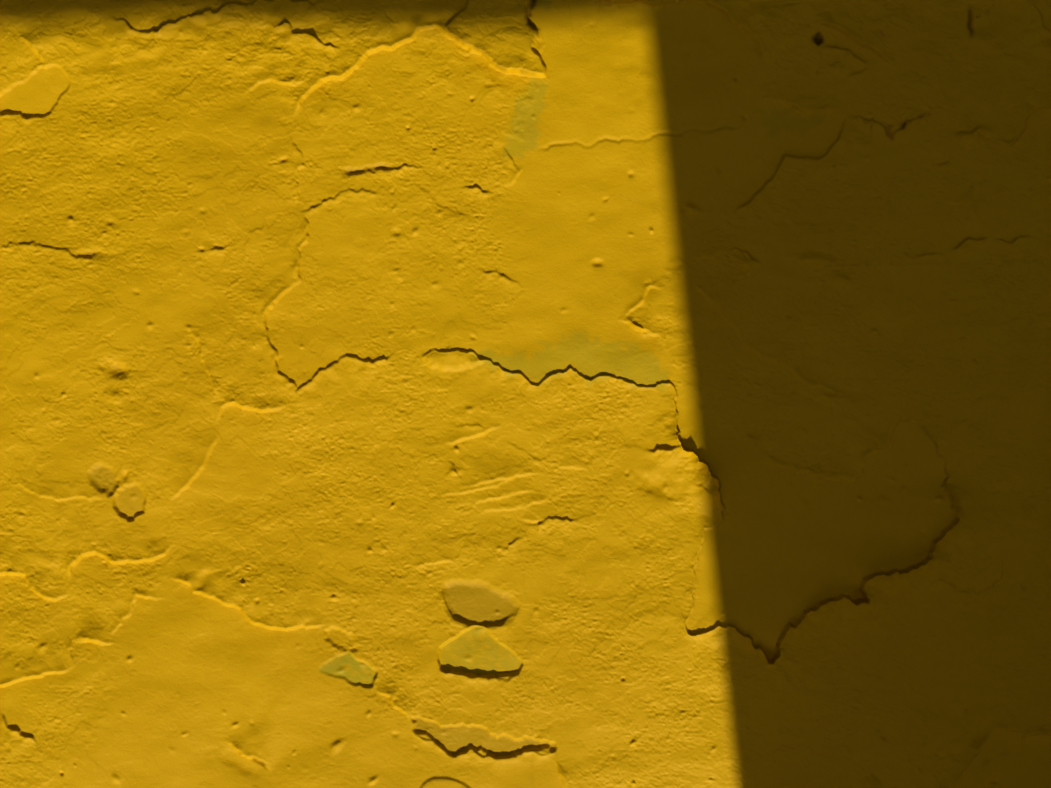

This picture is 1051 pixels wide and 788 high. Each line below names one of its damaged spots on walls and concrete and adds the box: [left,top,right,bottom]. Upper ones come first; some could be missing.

peeling [0,28,74,124]
peeling [264,18,342,58]
crack [239,10,544,116]
flaking render [0,238,112,265]
peeling [418,0,970,674]
peeling [317,624,382,691]
peeling [435,628,527,688]
peeling [407,714,579,788]